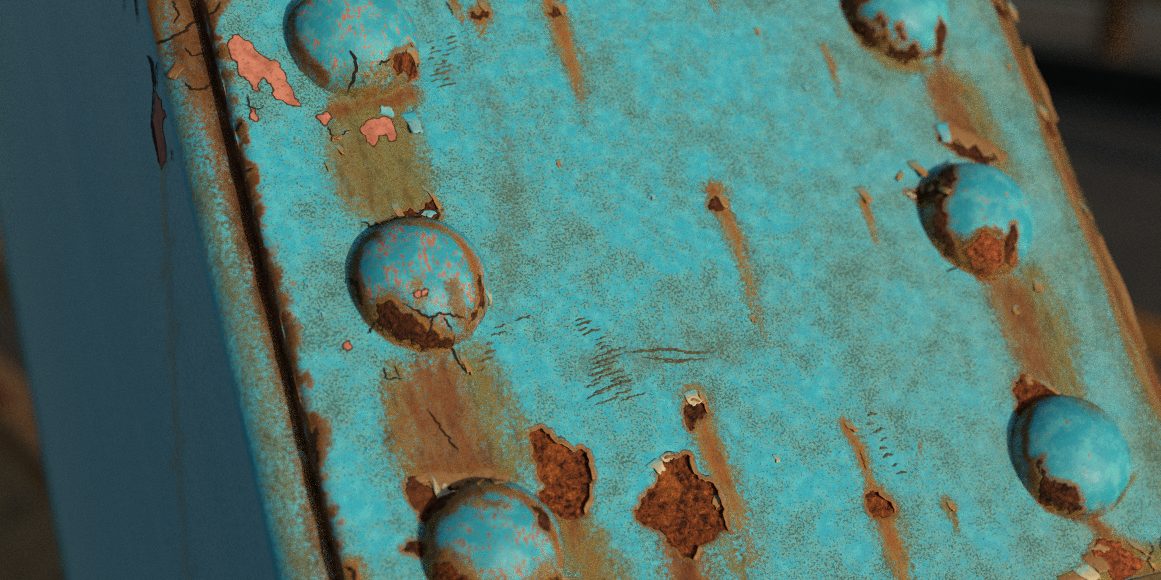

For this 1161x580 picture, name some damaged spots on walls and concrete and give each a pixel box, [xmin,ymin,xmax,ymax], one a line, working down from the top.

crack [123,0,215,169]
peeling [227,34,302,122]
peeling [316,105,423,155]
corrosion [821,44,840,96]
corrosion [146,0,368,580]
corrosion [287,0,632,580]
corrosion [703,180,762,332]
corrosion [839,0,1161,580]
corrosion [633,383,759,580]